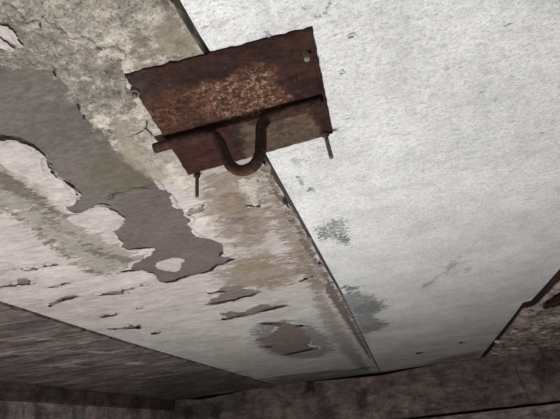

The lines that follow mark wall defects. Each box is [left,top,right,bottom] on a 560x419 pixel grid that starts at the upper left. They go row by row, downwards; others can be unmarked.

peeling [0,2,241,284]
water stain [232,178,259,205]
water stain [0,173,144,277]
peeling [0,262,59,289]
peeling [39,283,149,308]
peeling [199,285,289,321]
spalling [256,161,372,358]
water stain [340,287,389,337]